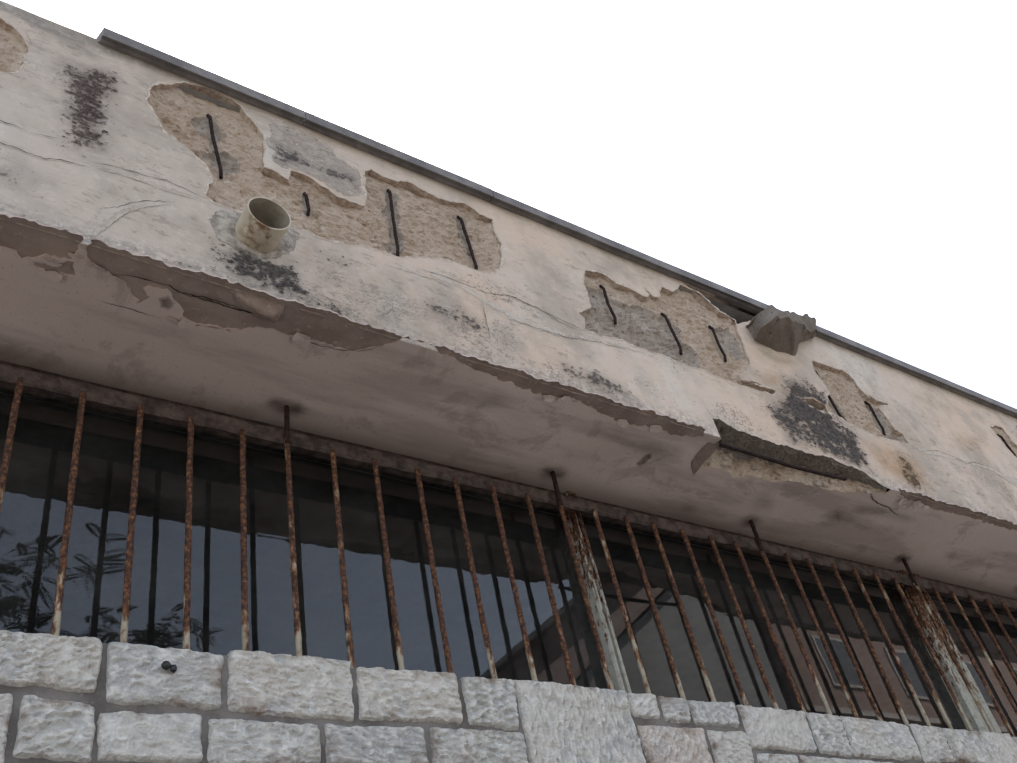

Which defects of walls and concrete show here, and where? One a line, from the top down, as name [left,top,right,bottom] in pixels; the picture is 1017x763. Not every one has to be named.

spalling [0,17,29,73]
damp [58,62,123,157]
spalling [145,81,505,274]
damp [209,237,353,316]
peeling [0,213,1017,531]
damp [766,374,877,476]